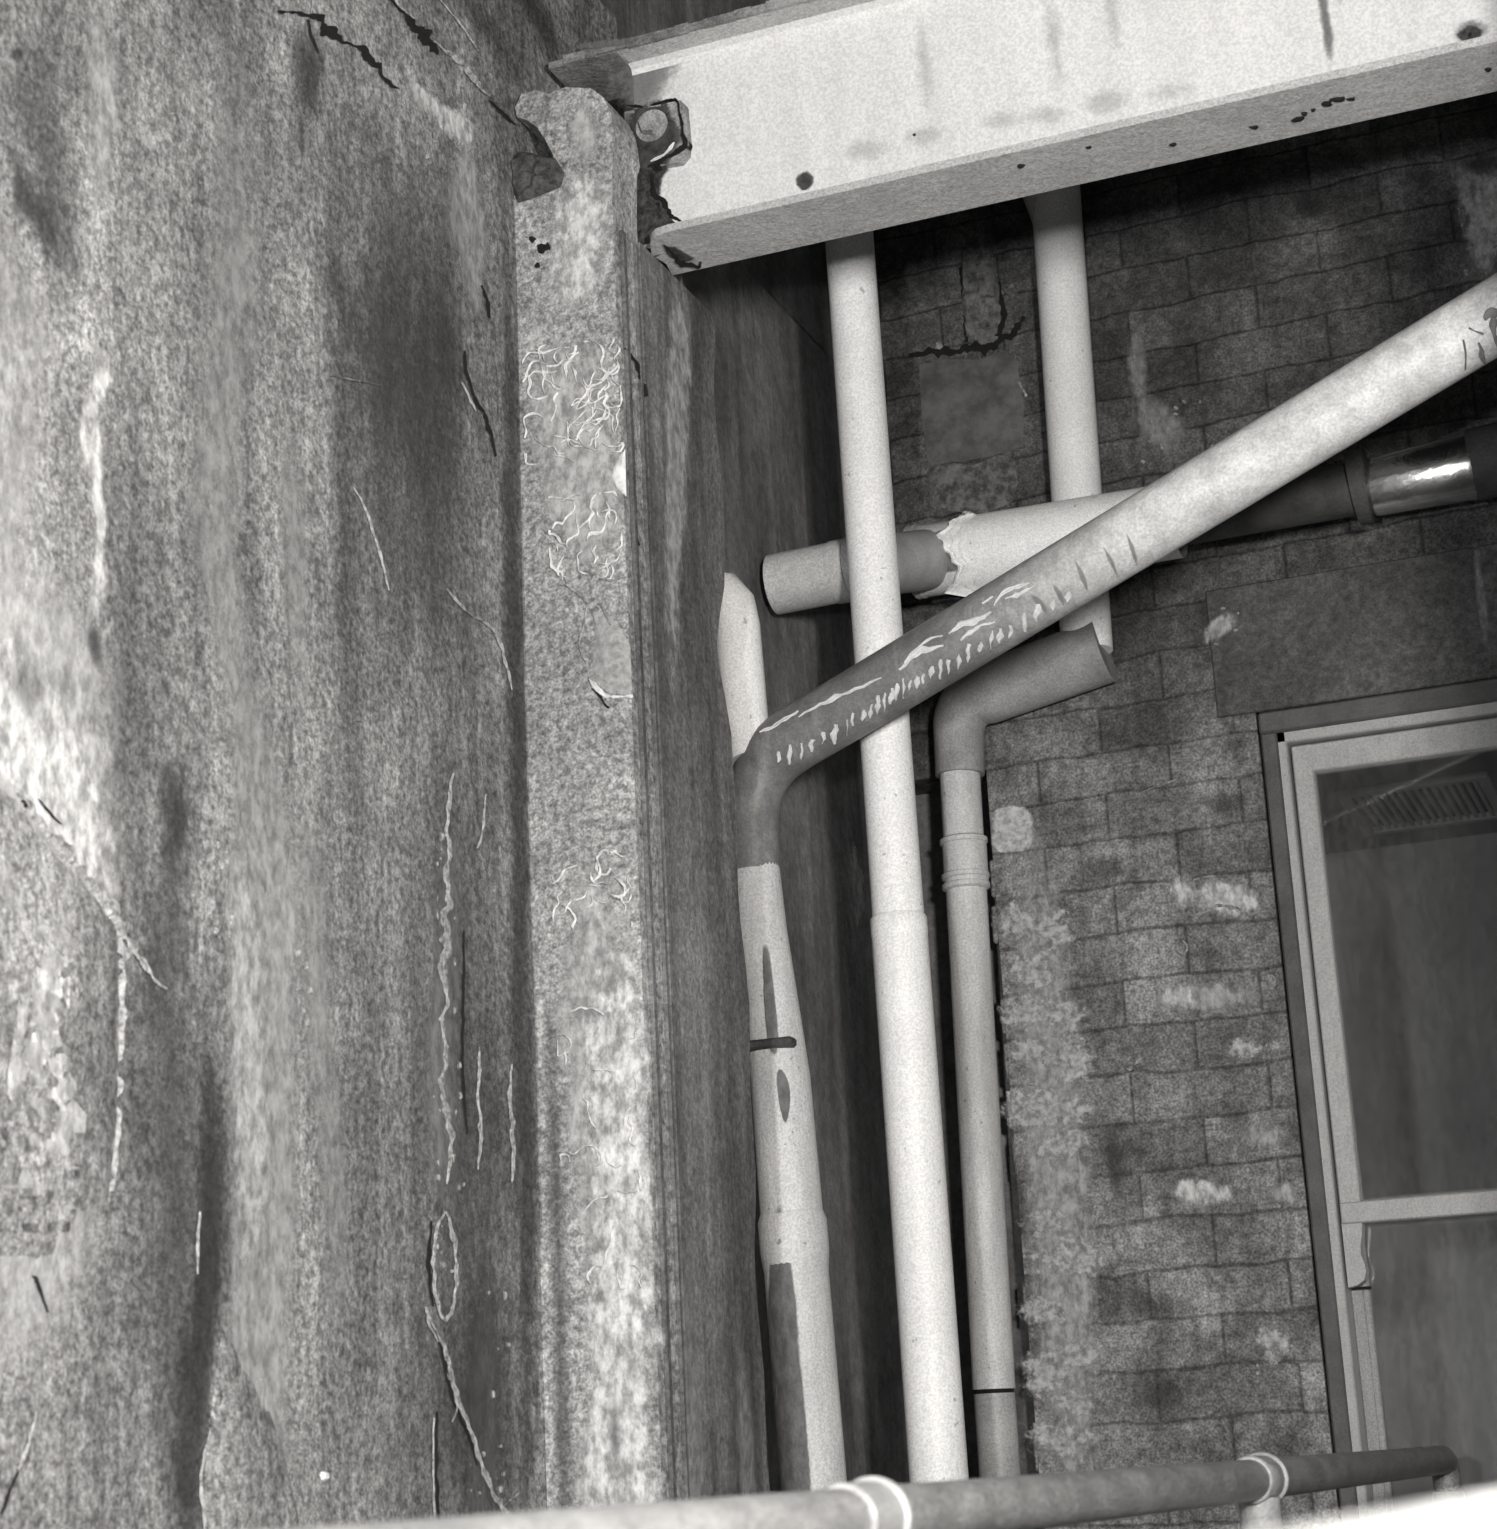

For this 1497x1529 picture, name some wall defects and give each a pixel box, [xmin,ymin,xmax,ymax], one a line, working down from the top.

crack [278,0,400,89]
crack [391,0,516,125]
rust [1319,0,1333,53]
rust [1457,21,1483,41]
rust [1291,97,1355,122]
crack [425,1306,520,1518]